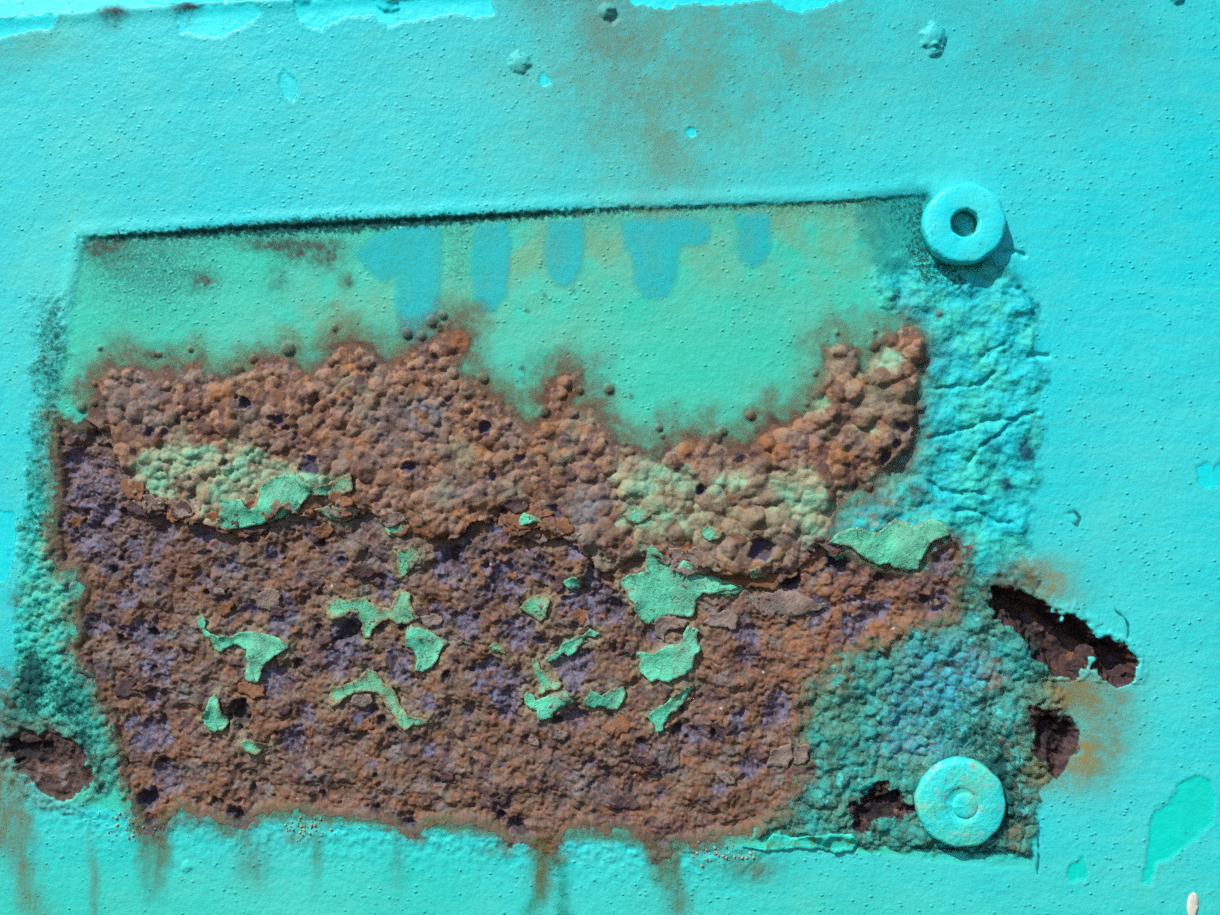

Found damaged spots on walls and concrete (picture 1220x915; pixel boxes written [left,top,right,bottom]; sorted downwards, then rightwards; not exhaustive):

peeling [0,0,60,39]
peeling [147,0,262,39]
peeling [294,0,495,32]
peeling [629,0,842,13]
corrosion [44,306,1066,880]
corrosion [0,769,29,838]
peeling [1142,775,1216,884]